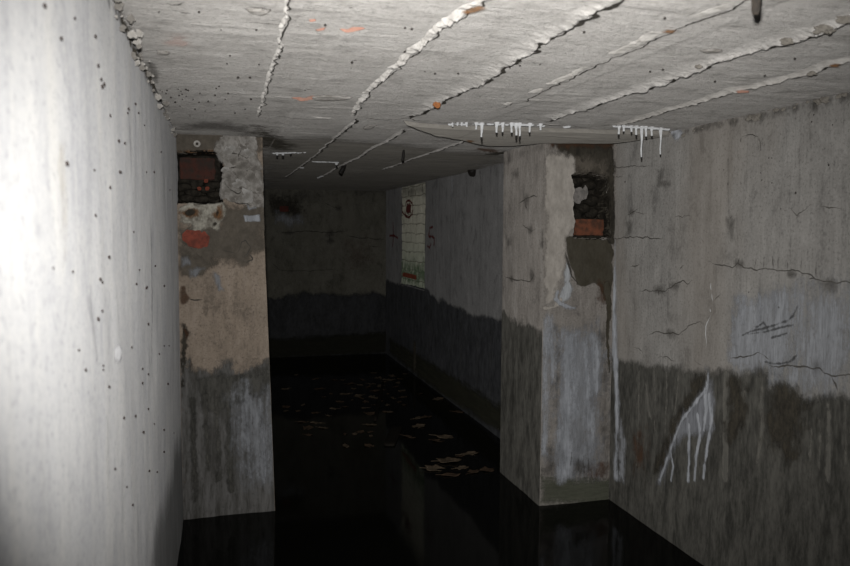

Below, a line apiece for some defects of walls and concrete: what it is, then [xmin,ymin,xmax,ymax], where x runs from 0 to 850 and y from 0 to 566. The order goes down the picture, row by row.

spalling [121,17,163,105]
spalling [177,150,224,205]
spalling [571,172,612,240]
spalling [182,230,210,249]
crack [710,256,850,286]
water stain [155,143,850,566]
crack [733,352,850,391]